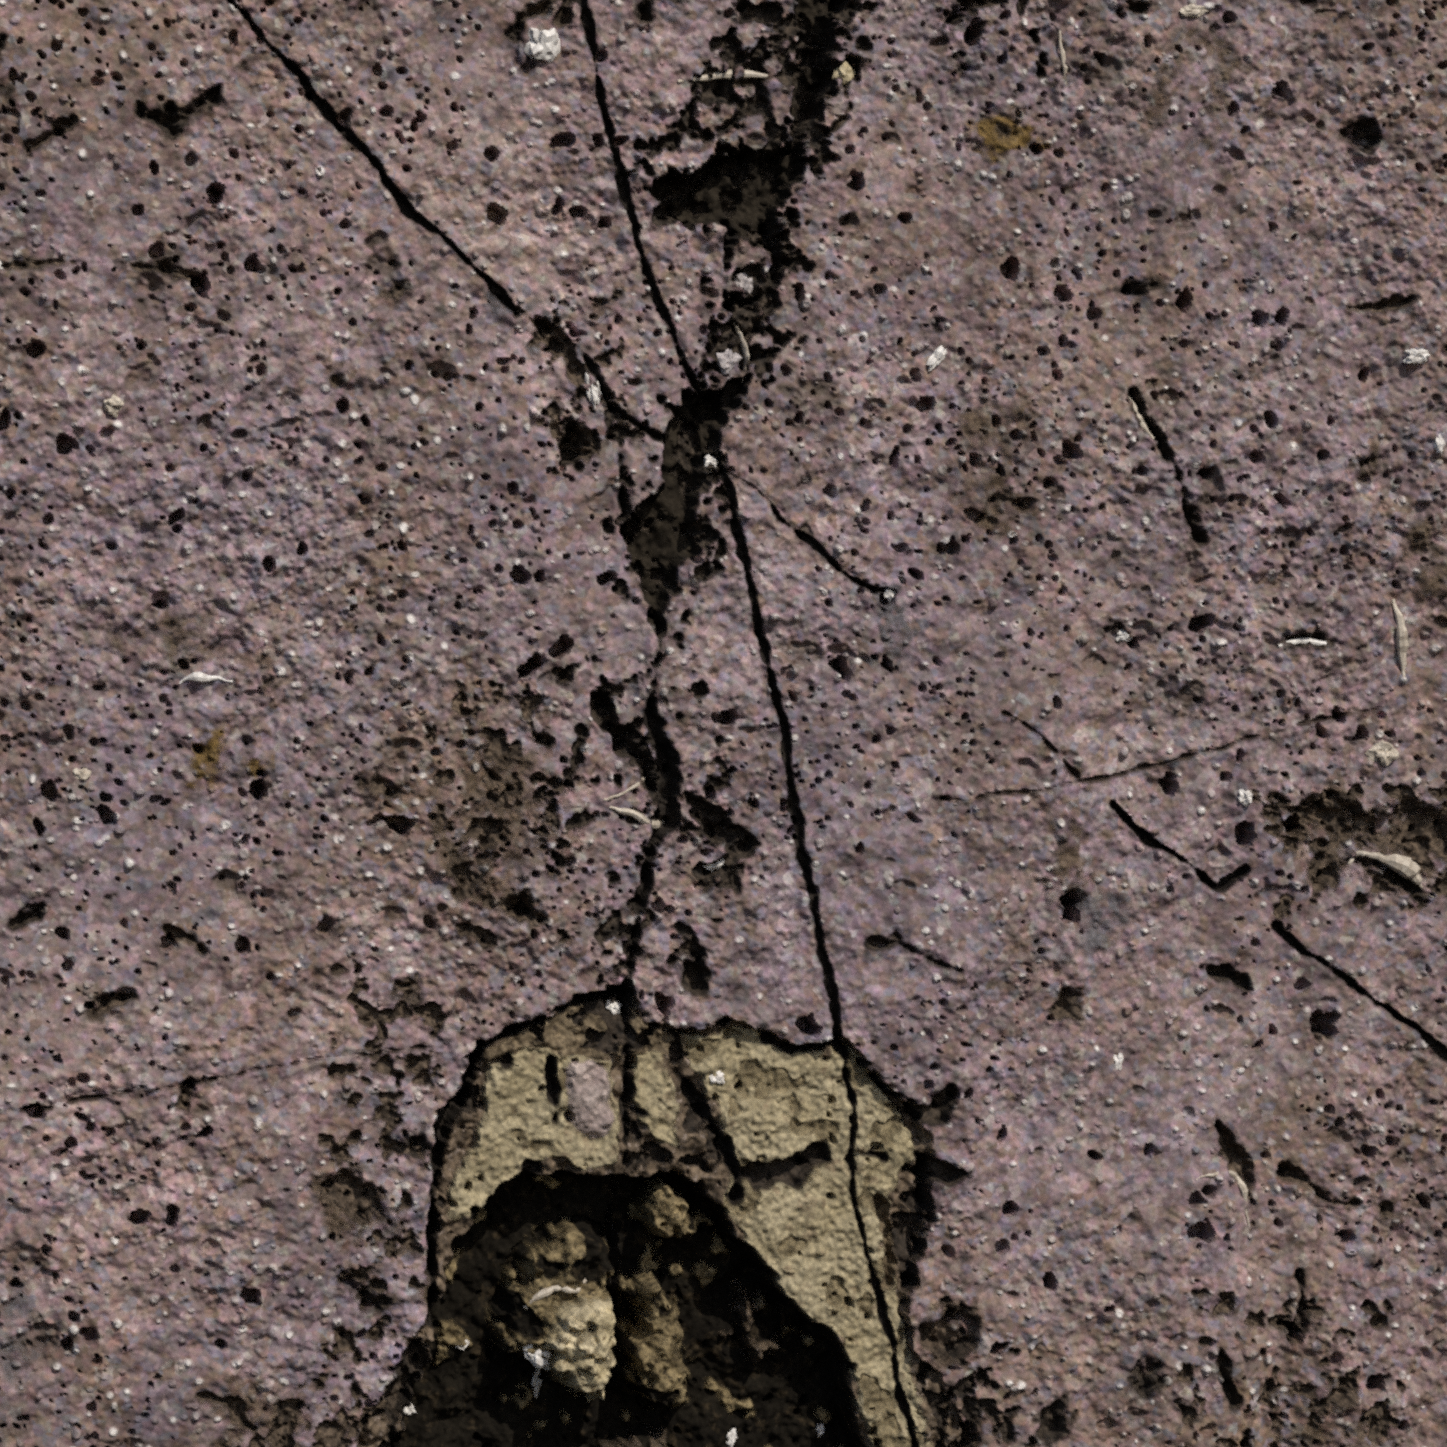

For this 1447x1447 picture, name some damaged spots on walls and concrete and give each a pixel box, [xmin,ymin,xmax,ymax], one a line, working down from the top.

hole [635,0,654,23]
peeling [678,69,768,83]
peeling [704,454,718,474]
peeling [884,589,895,602]
crack [226,0,919,1447]
crack [1297,707,1381,726]
crack [939,711,1259,893]
spalling [864,931,963,973]
crack [1271,920,1447,1062]
crack [0,1057,322,1113]
spalling [176,1077,195,1113]
spalling [196,953,1083,1447]